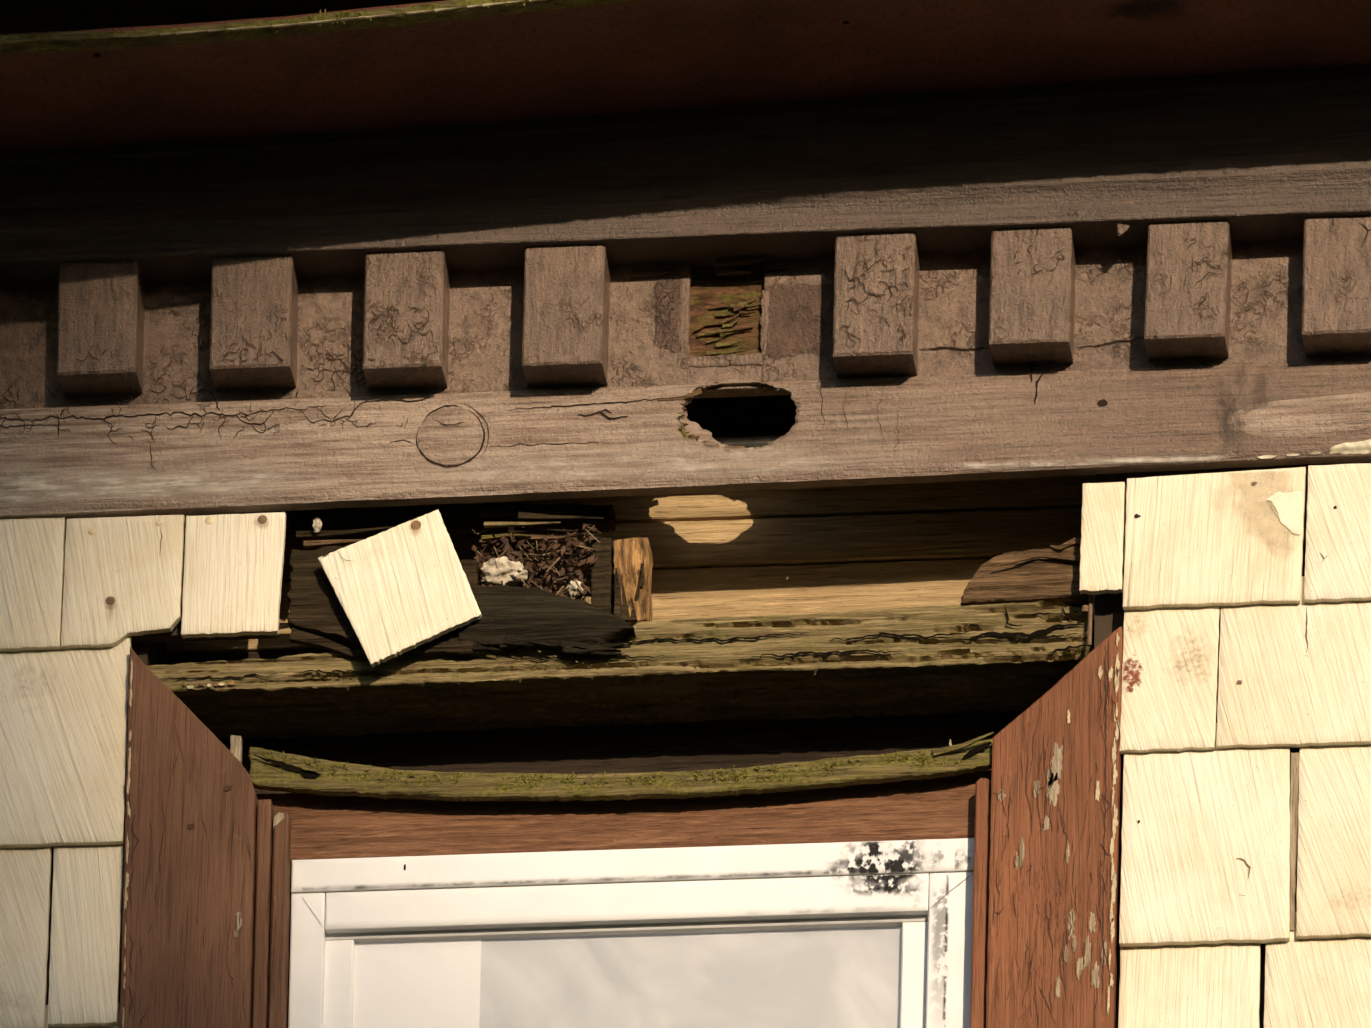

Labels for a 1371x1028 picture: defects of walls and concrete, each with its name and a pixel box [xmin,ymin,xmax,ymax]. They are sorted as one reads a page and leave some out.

crack [808,253,990,350]
crack [1014,245,1066,274]
crack [1183,237,1222,306]
crack [1078,337,1144,348]
crack [0,306,671,474]
peeling [1032,742,1063,830]
damp [730,842,920,893]
peeling [1014,837,1025,870]
peeling [1054,633,1120,1011]